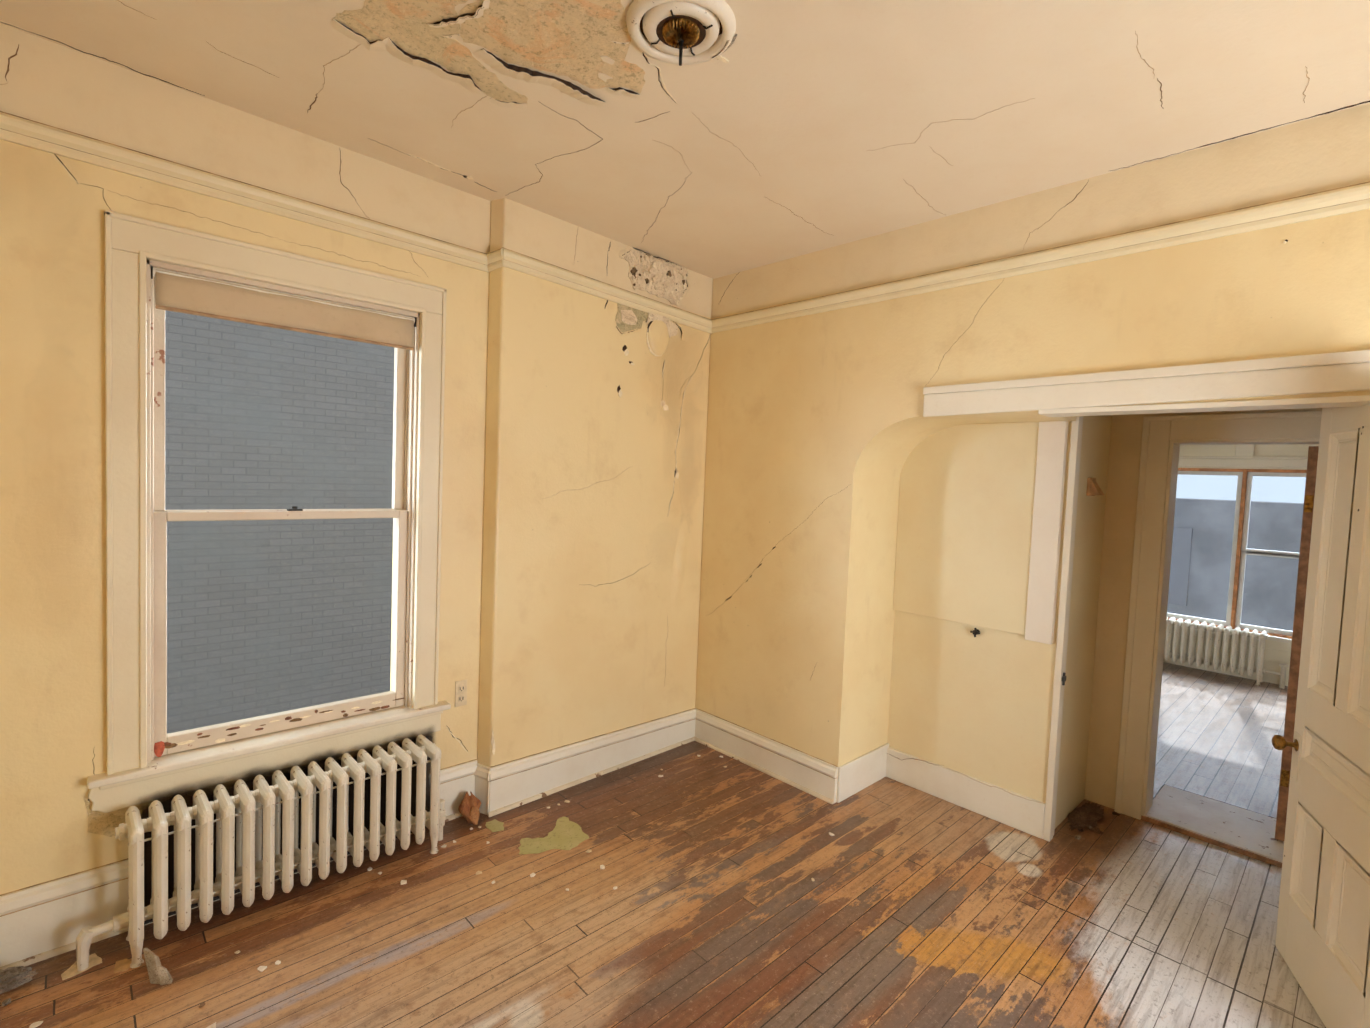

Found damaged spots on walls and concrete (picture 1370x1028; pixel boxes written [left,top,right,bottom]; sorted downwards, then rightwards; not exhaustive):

crack [0,21,205,96]
crack [307,44,361,113]
flaking render [330,0,646,109]
crack [1135,31,1164,109]
crack [48,152,428,277]
crack [339,101,603,219]
crack [574,52,832,266]
crack [1023,66,1370,249]
spalling [618,245,690,305]
flaking render [613,303,648,365]
crack [706,487,847,616]
spalling [83,798,140,837]